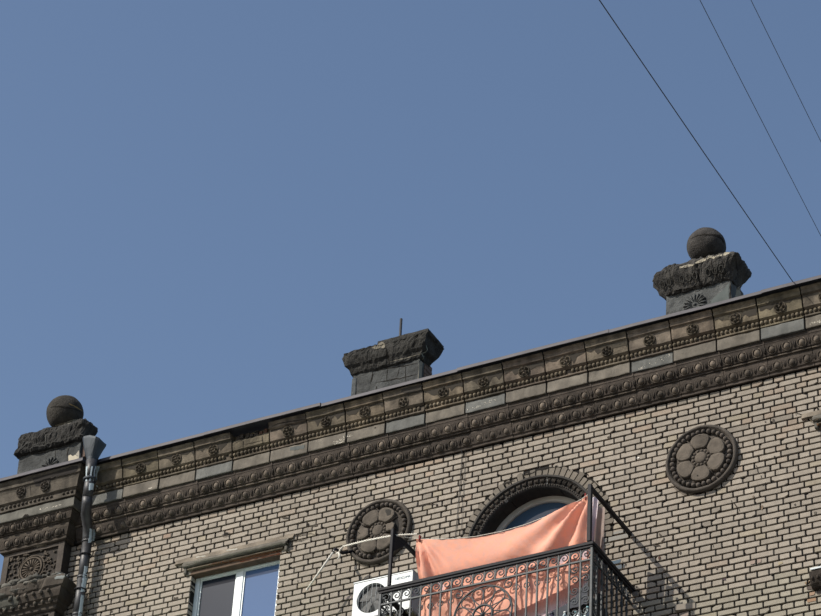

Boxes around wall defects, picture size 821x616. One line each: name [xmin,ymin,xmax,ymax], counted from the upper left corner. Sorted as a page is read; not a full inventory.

peeling [68,446,100,490]